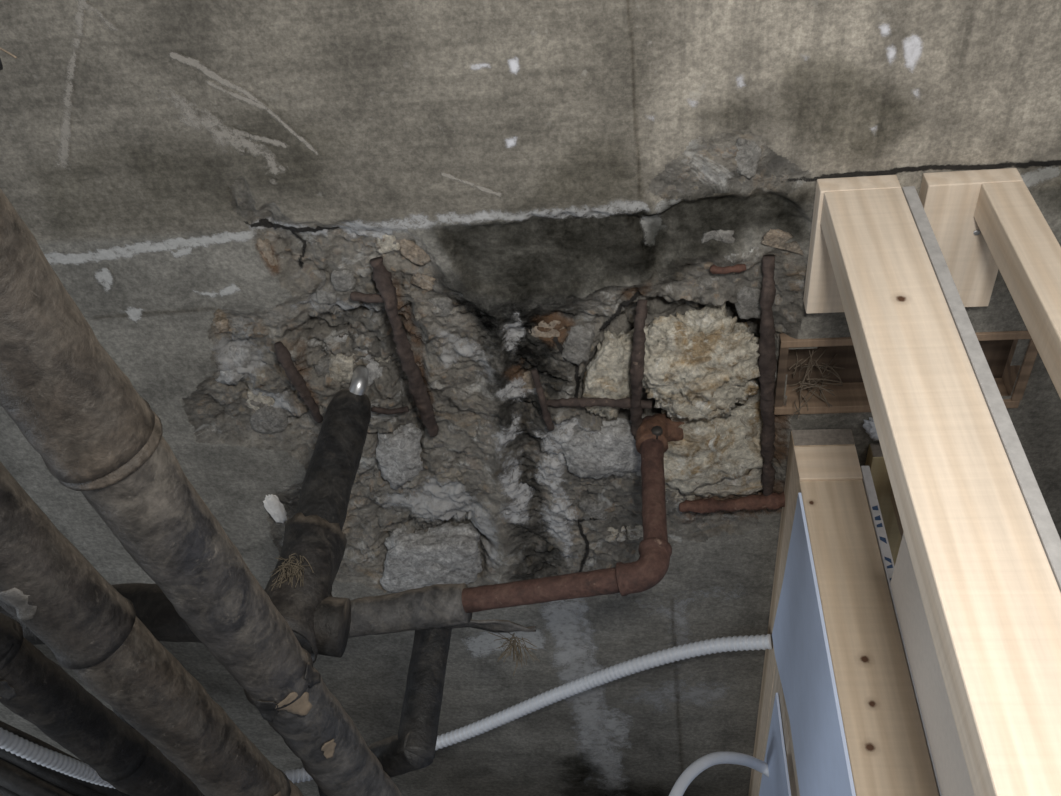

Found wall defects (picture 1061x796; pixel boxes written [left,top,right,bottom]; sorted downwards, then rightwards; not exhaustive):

crack [788,160,1061,182]
crack [244,218,339,268]
water stain [44,194,803,580]
spalling [182,177,808,593]
water stain [465,598,604,684]
water stain [566,686,637,796]